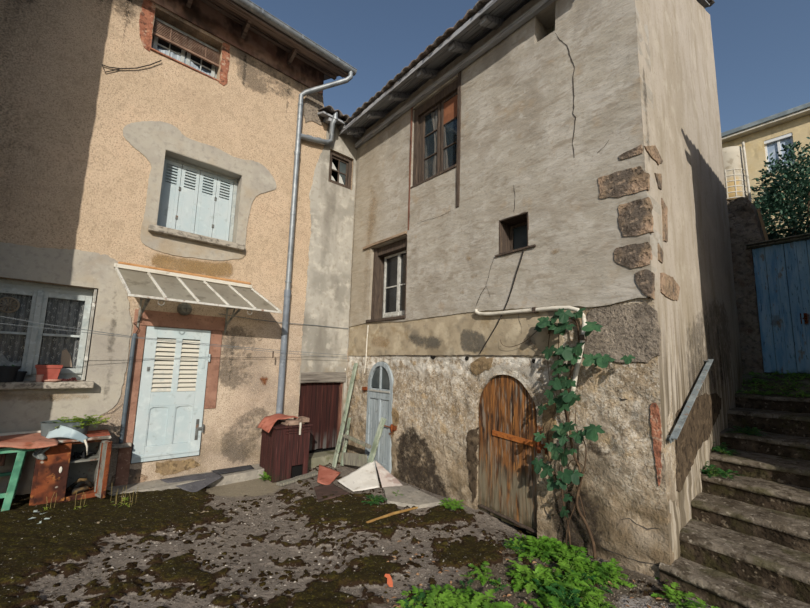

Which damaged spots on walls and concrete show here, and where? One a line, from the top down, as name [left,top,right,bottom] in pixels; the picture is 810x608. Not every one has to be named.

crack [555,33,576,153]
water stain [411,336,440,347]
water stain [461,330,486,352]
water stain [396,428,449,498]
spalling [650,403,662,486]
spalling [675,393,722,492]